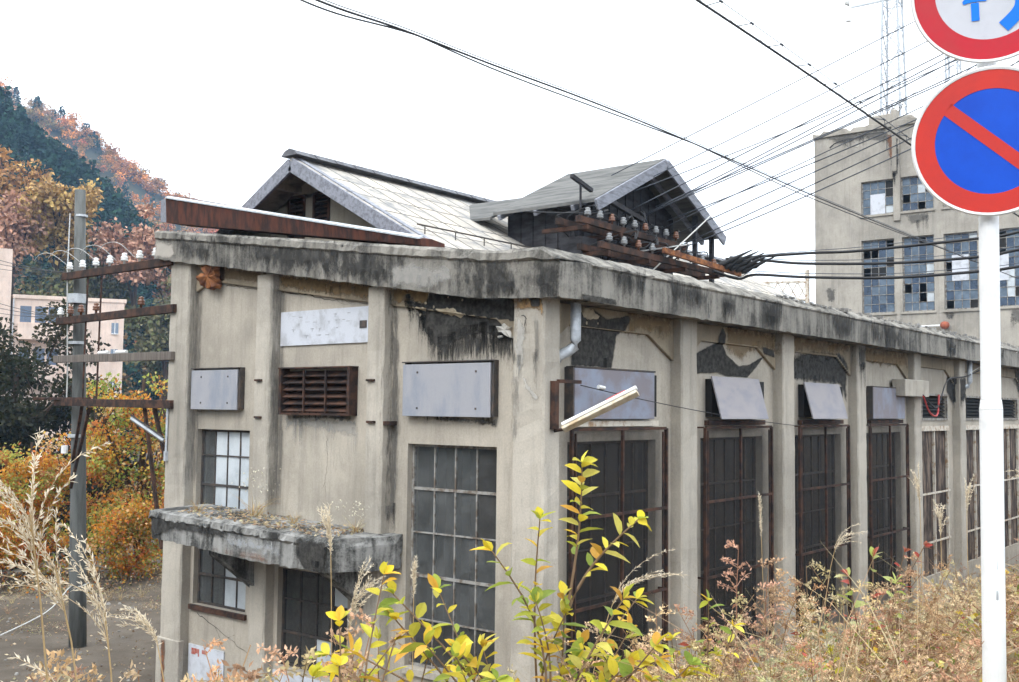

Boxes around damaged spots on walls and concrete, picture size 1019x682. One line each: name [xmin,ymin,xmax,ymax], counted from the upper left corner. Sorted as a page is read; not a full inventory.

peeling [415,297,464,318]
peeling [496,323,513,338]
peeling [581,306,600,325]
leakage [572,294,671,368]
leakage [607,269,646,296]
leakage [671,279,736,314]
leakage [697,300,782,377]
leakage [151,518,277,554]
leakage [296,539,325,571]